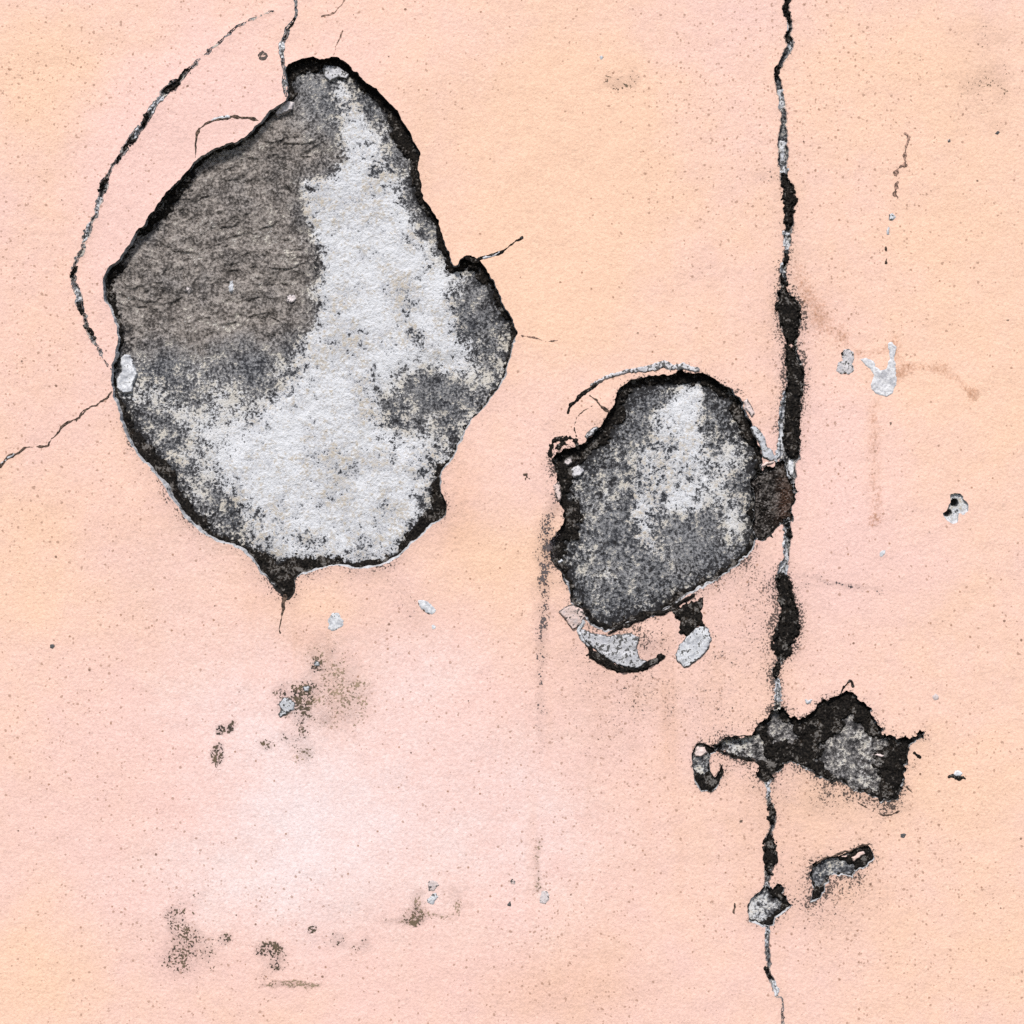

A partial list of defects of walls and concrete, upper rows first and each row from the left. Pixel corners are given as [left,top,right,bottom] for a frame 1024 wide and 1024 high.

crack [0,0,298,468]
crack [465,236,523,263]
spalling [103,56,518,600]
crack [770,0,805,711]
peeling [836,342,897,397]
spalling [547,360,775,673]
spalling [692,679,925,816]
spalling [747,882,792,927]
crack [762,782,778,888]
spalling [809,843,875,903]
crack [763,925,785,1024]